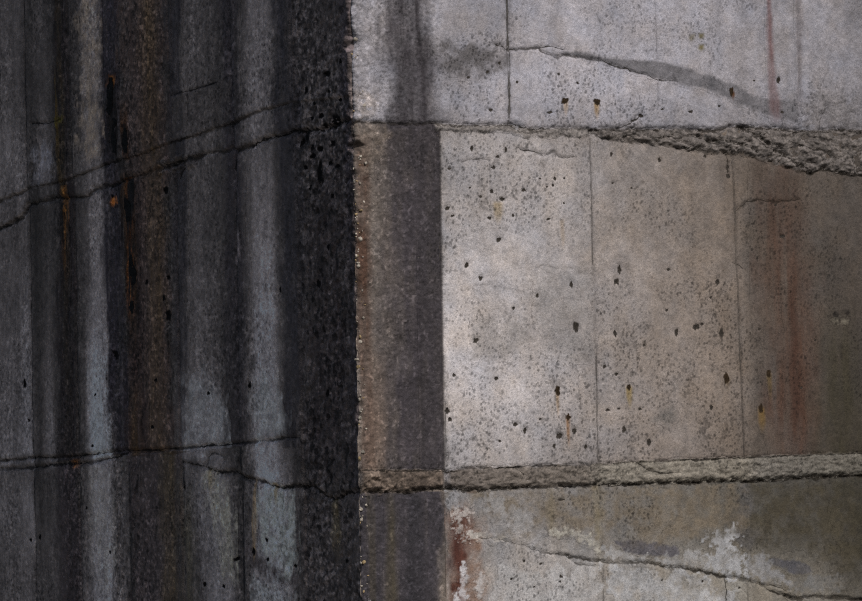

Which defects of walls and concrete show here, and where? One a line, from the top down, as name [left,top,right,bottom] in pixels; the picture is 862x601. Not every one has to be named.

crack [495,44,675,81]
corrosion [764,0,784,126]
crack [0,82,862,231]
spalling [432,86,862,178]
damp [28,0,232,601]
damp [161,0,848,601]
crack [0,437,862,500]
spalling [357,440,862,527]
corrosion [444,492,494,601]
crack [479,537,862,601]